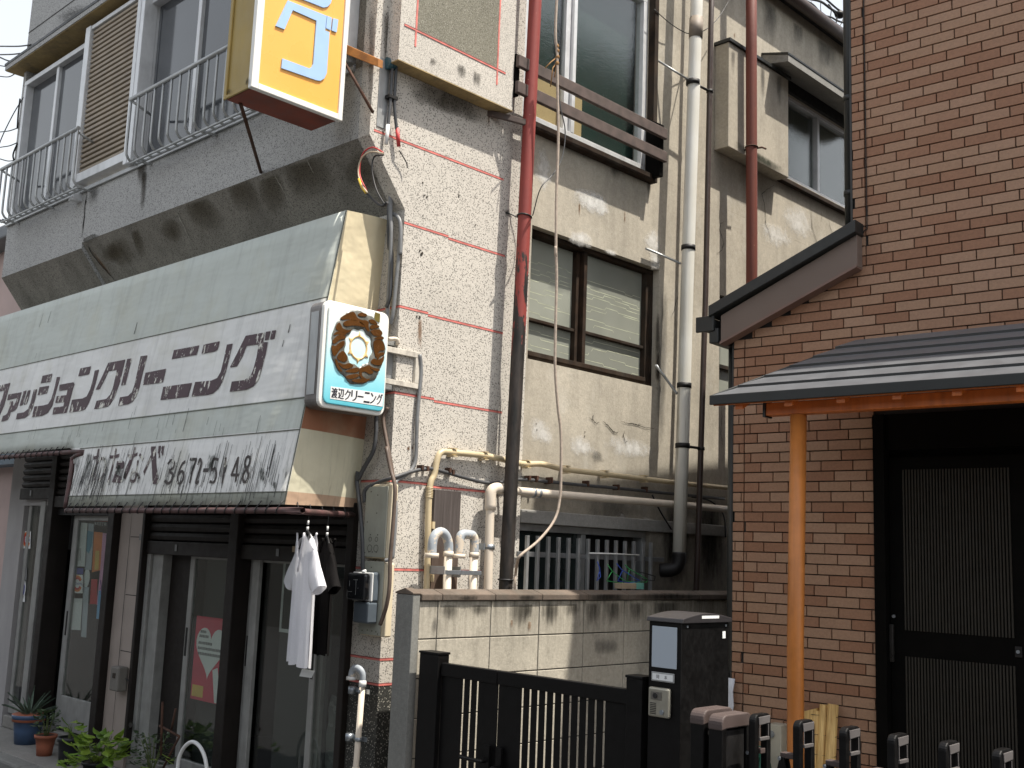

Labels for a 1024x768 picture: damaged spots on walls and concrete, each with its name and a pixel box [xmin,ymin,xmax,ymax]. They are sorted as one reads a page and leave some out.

crack [590,416,654,443]
water stain [590,594,619,615]